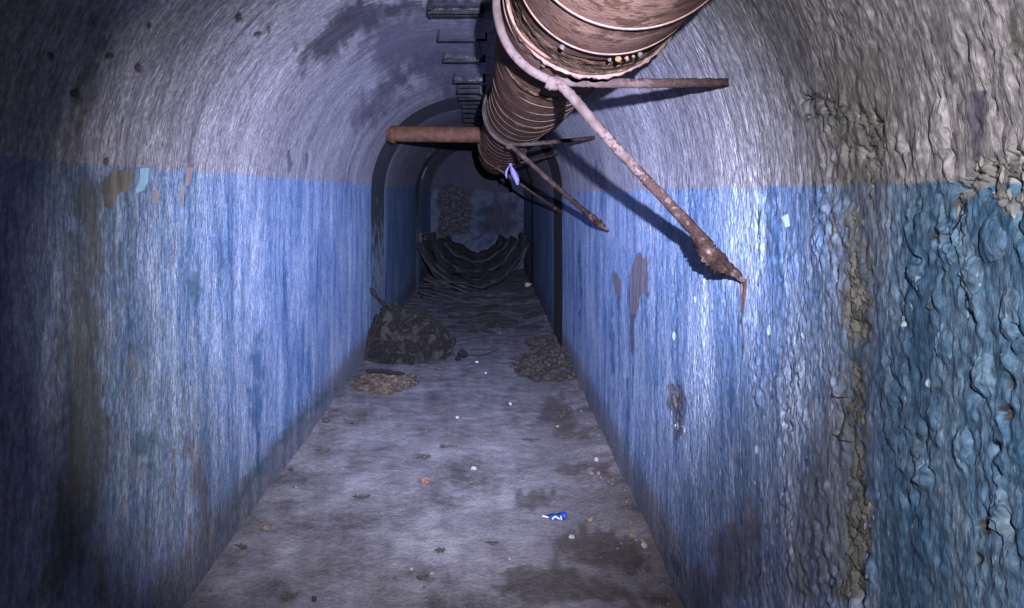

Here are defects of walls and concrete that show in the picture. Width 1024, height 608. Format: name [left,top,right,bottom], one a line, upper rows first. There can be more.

damp [301,0,494,122]
spalling [806,93,887,169]
peeling [102,158,160,210]
peeling [179,167,193,206]
spalling [954,154,1024,219]
damp [668,385,686,438]